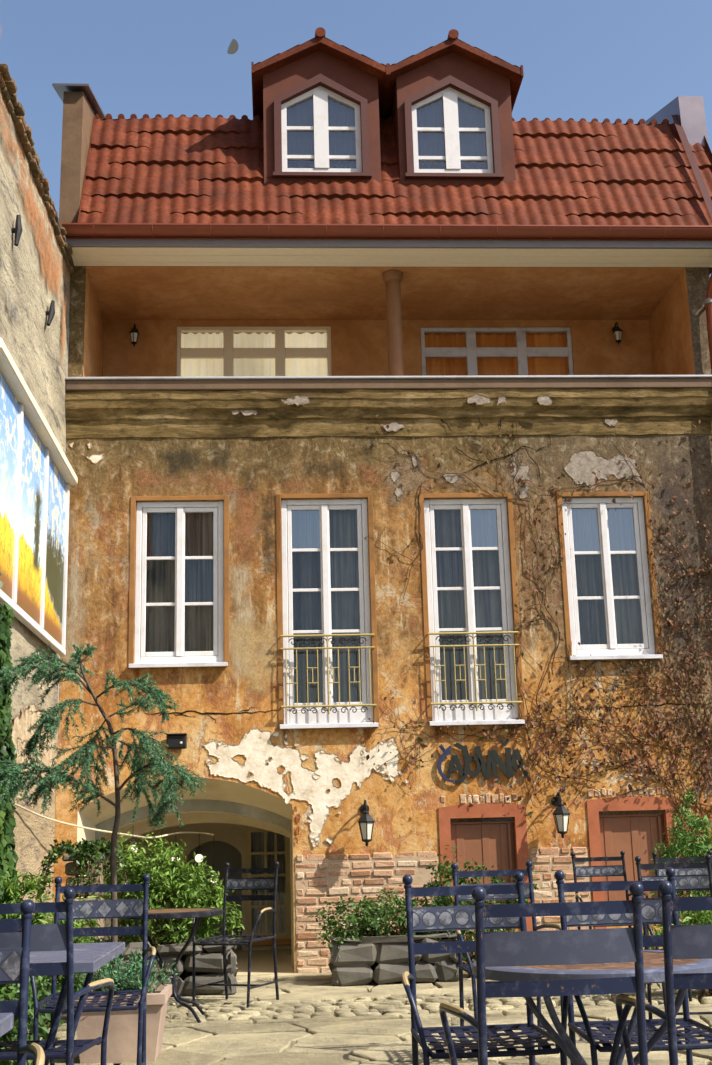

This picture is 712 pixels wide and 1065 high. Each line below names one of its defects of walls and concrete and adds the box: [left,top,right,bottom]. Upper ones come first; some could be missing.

peeling [281,395,312,406]
peeling [467,394,507,406]
peeling [537,395,553,405]
peeling [383,421,412,432]
flaking render [564,450,645,487]
crack [145,707,278,722]
flaking render [203,728,439,974]